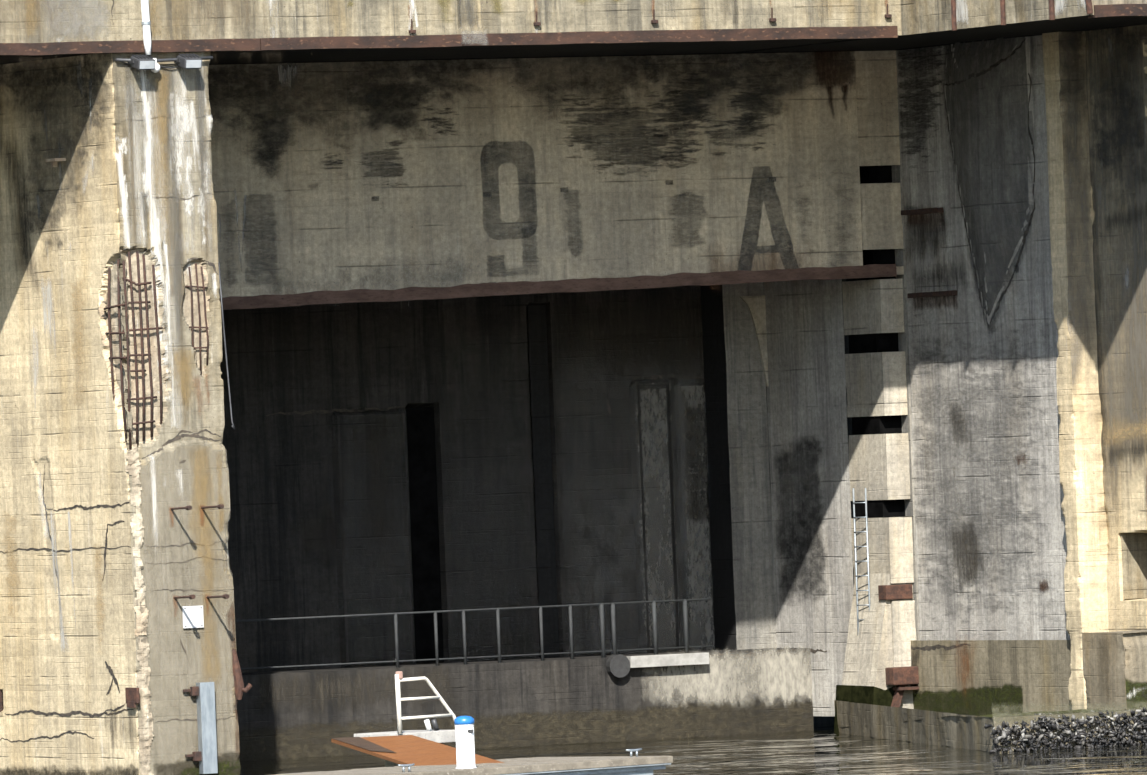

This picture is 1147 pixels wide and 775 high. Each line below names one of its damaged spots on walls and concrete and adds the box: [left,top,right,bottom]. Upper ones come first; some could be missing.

water stain [116,66,221,425]
spalling [182,259,210,377]
spalling [98,247,172,775]